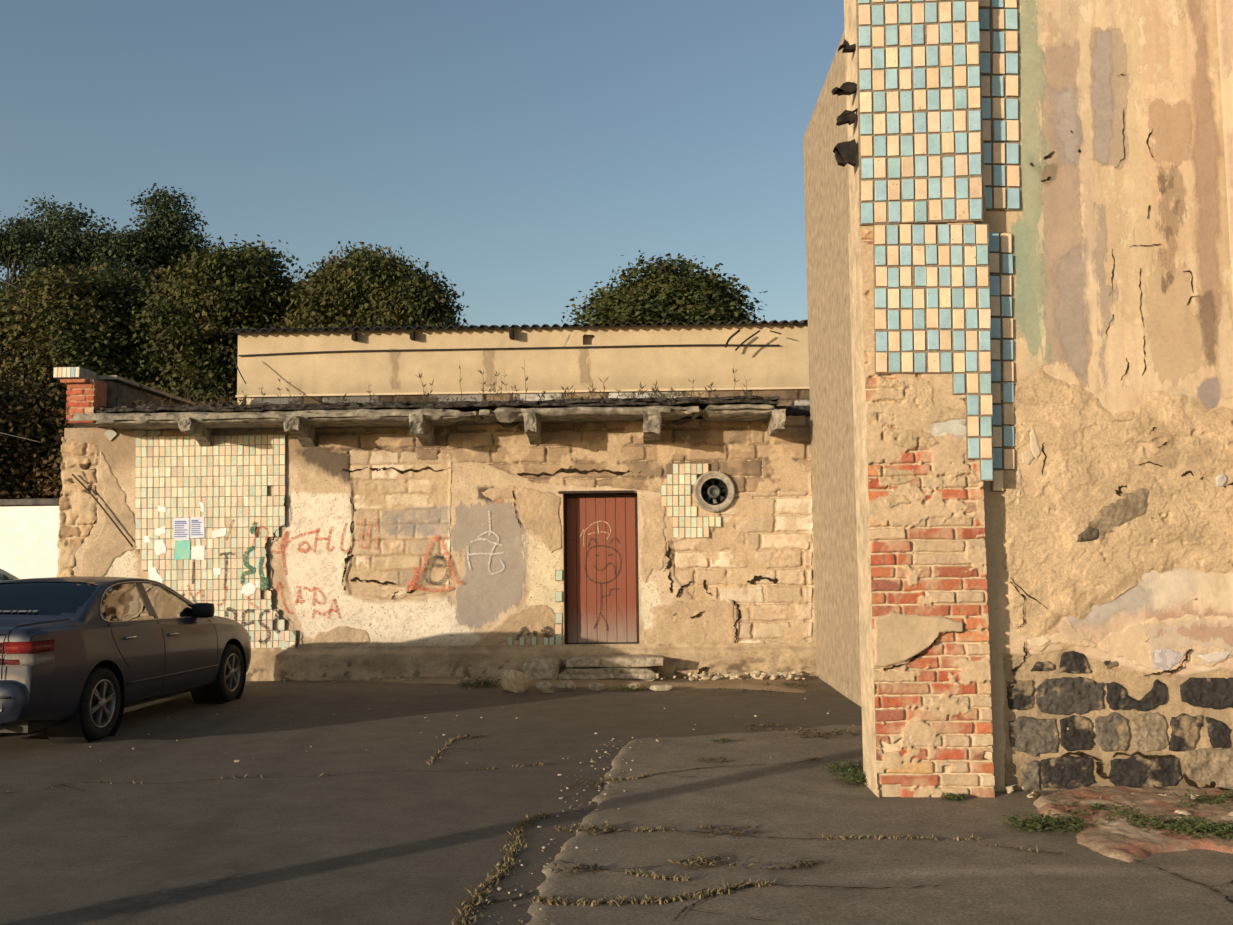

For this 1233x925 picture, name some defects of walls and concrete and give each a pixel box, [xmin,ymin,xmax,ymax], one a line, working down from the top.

flaking render [875,376,966,450]
flaking render [998,0,1233,791]
flaking render [57,437,99,577]
spalling [315,416,813,643]
flaking render [876,467,918,508]